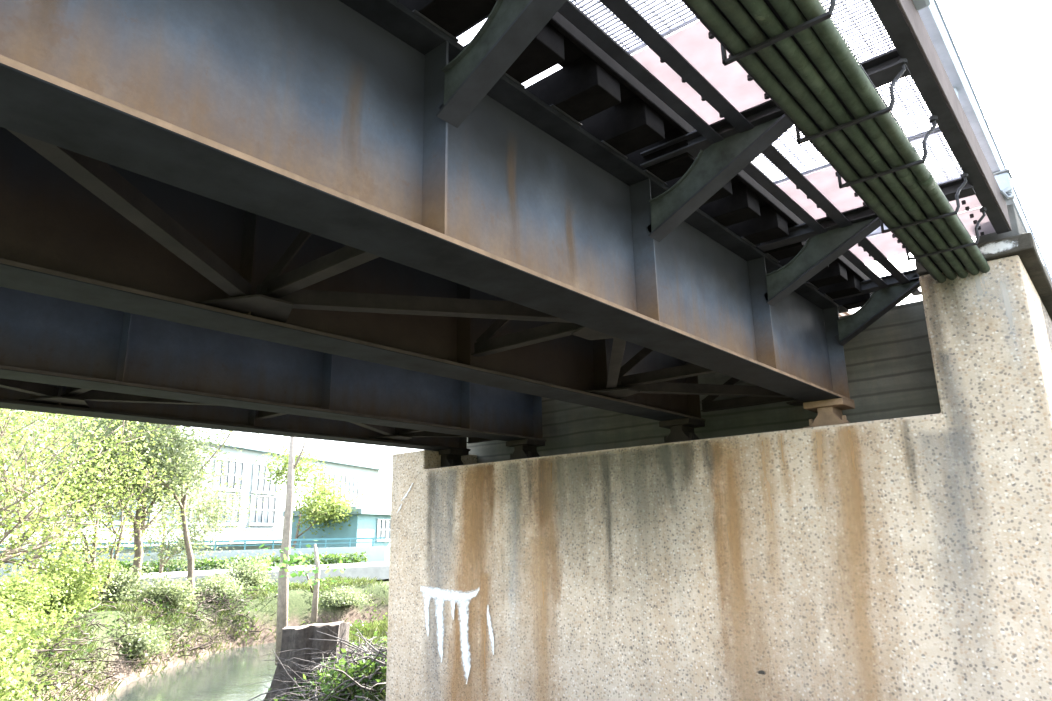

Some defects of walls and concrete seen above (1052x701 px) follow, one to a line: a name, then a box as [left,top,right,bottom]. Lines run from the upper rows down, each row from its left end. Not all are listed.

rust [453,577,486,701]